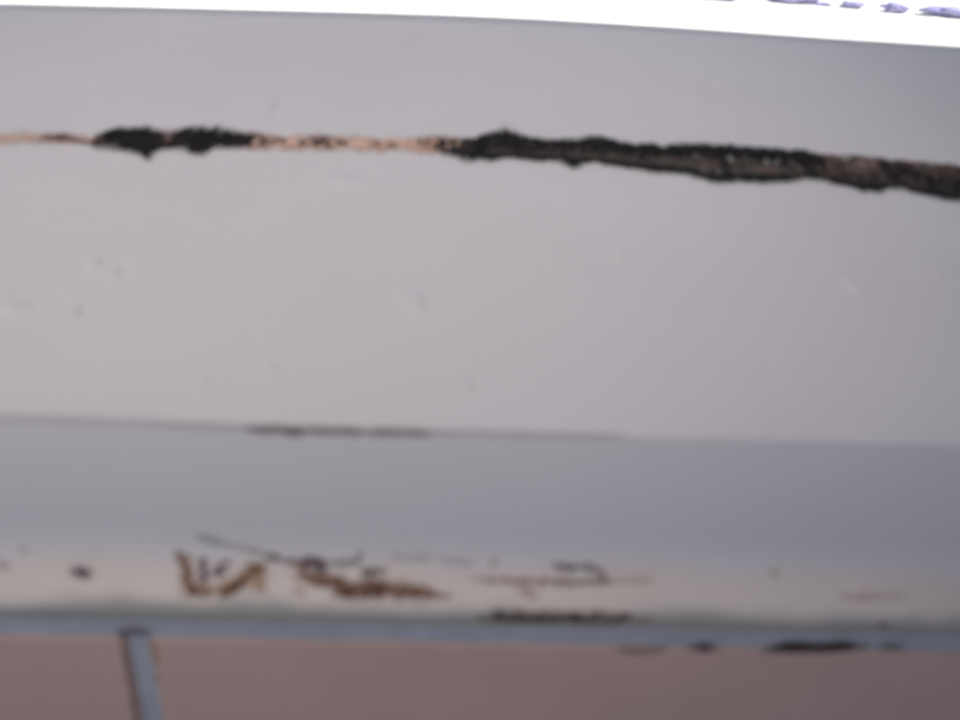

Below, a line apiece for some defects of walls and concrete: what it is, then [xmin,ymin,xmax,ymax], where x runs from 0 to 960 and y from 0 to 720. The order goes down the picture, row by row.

crack [0,123,960,201]